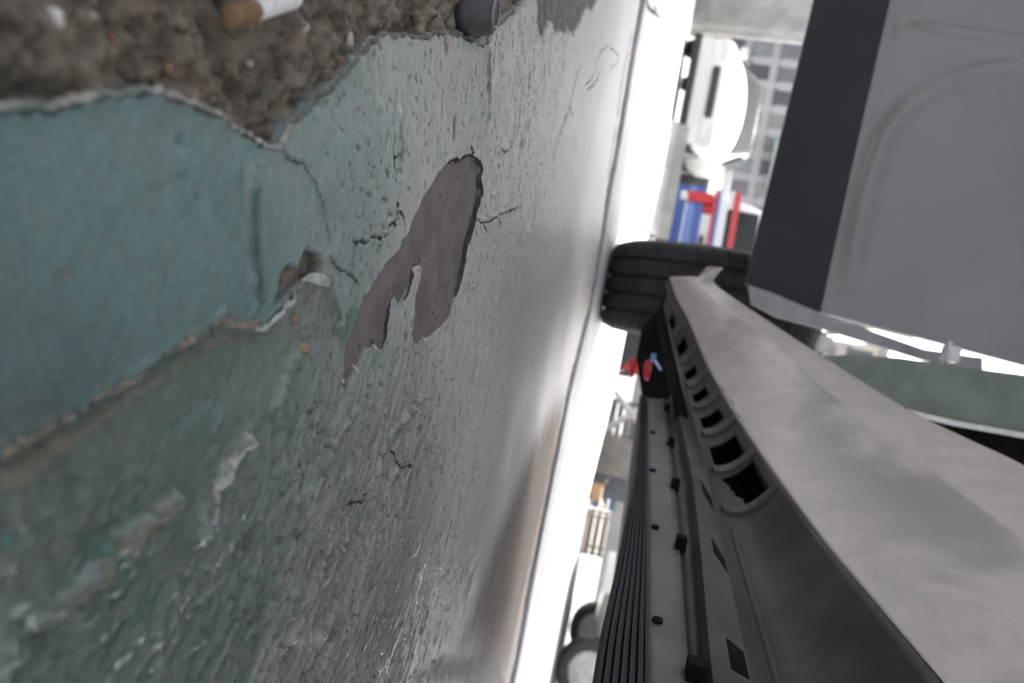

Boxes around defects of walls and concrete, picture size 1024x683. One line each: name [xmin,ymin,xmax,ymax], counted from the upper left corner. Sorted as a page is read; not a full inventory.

spalling [0,0,491,150]
peeling [342,154,484,384]
crack [476,196,521,231]
crack [390,450,412,474]